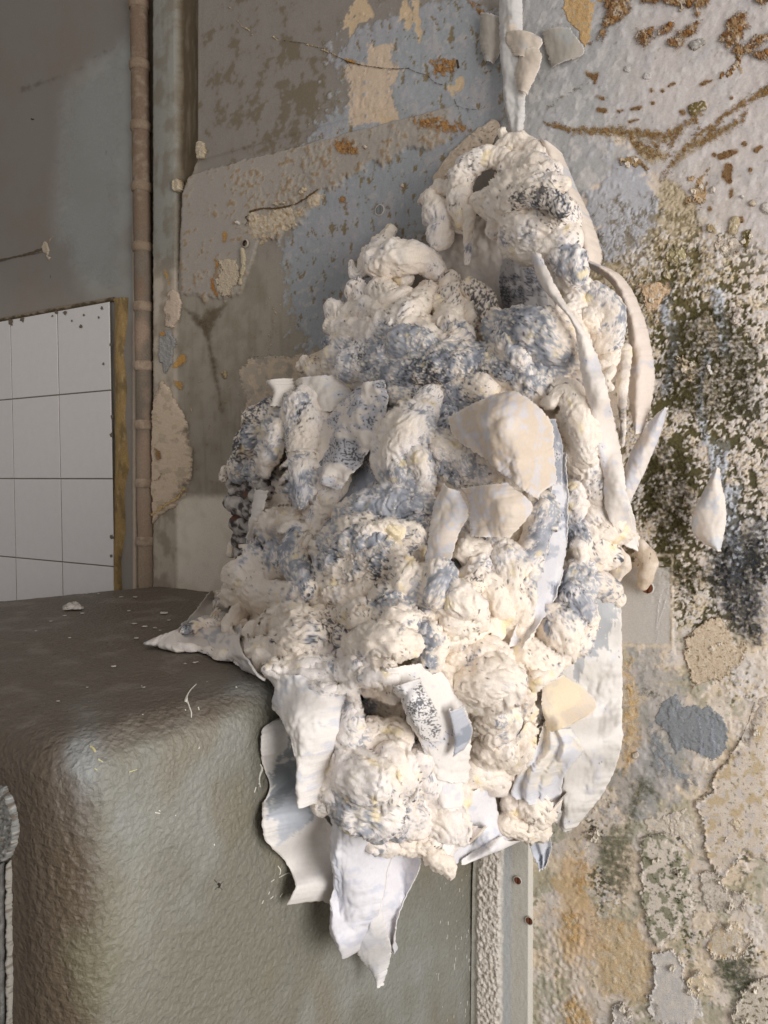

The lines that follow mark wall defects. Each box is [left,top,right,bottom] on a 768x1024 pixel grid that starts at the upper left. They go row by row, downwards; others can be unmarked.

crack [229,7,467,109]
peeling [480,0,602,132]
spalling [617,155,650,171]
spalling [211,259,240,297]
spalling [150,269,193,524]
damp [663,308,757,421]
damp [644,444,766,646]
peeling [638,694,768,1024]